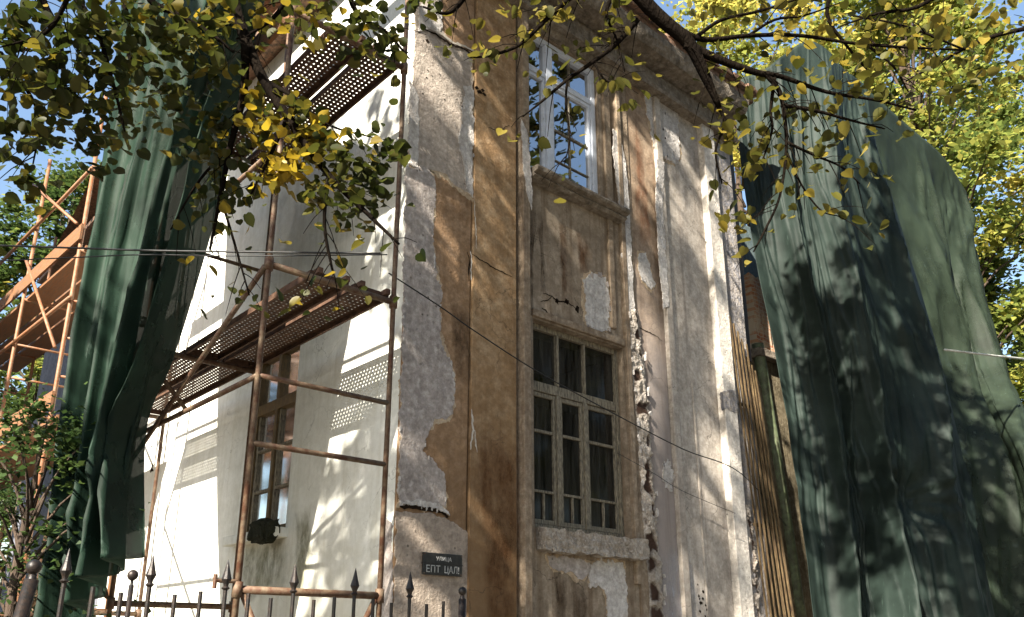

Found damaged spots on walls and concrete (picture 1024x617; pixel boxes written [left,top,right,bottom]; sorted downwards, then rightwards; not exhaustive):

flaking render [381,0,475,617]
crack [540,293,579,313]
spalling [581,271,611,333]
spalling [545,553,628,617]